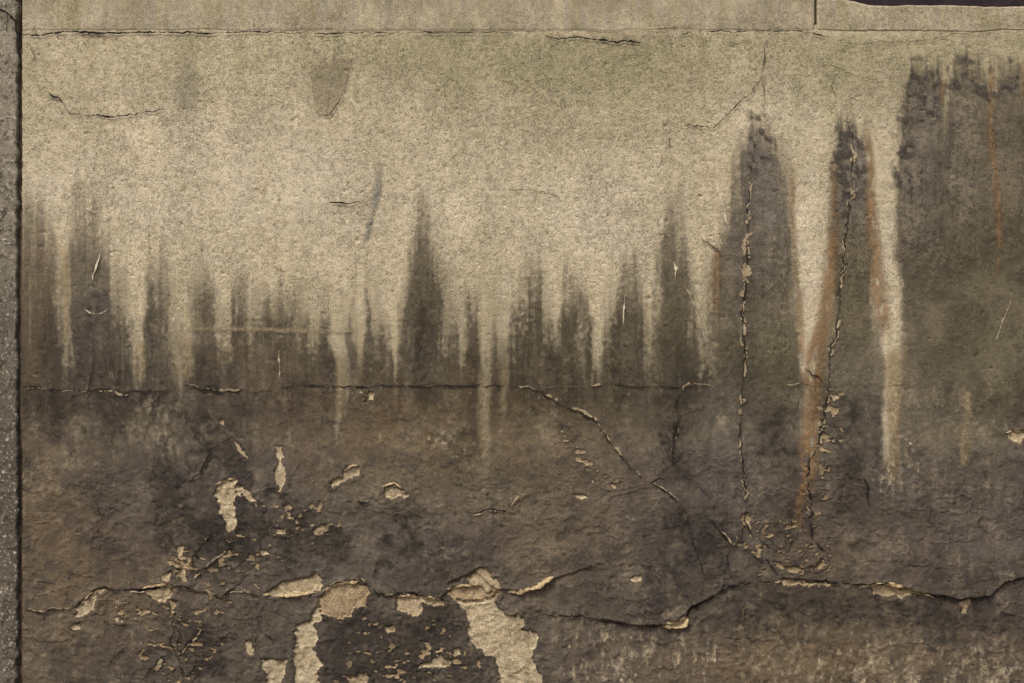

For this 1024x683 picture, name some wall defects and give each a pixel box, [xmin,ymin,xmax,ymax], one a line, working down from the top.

crack [0,9,512,118]
crack [543,34,653,57]
crack [654,25,1023,168]
water stain [20,55,1024,567]
crack [26,120,1024,644]
corrosion [800,233,836,476]
peeling [71,587,105,630]
peeling [115,446,542,683]
peeling [736,511,844,587]